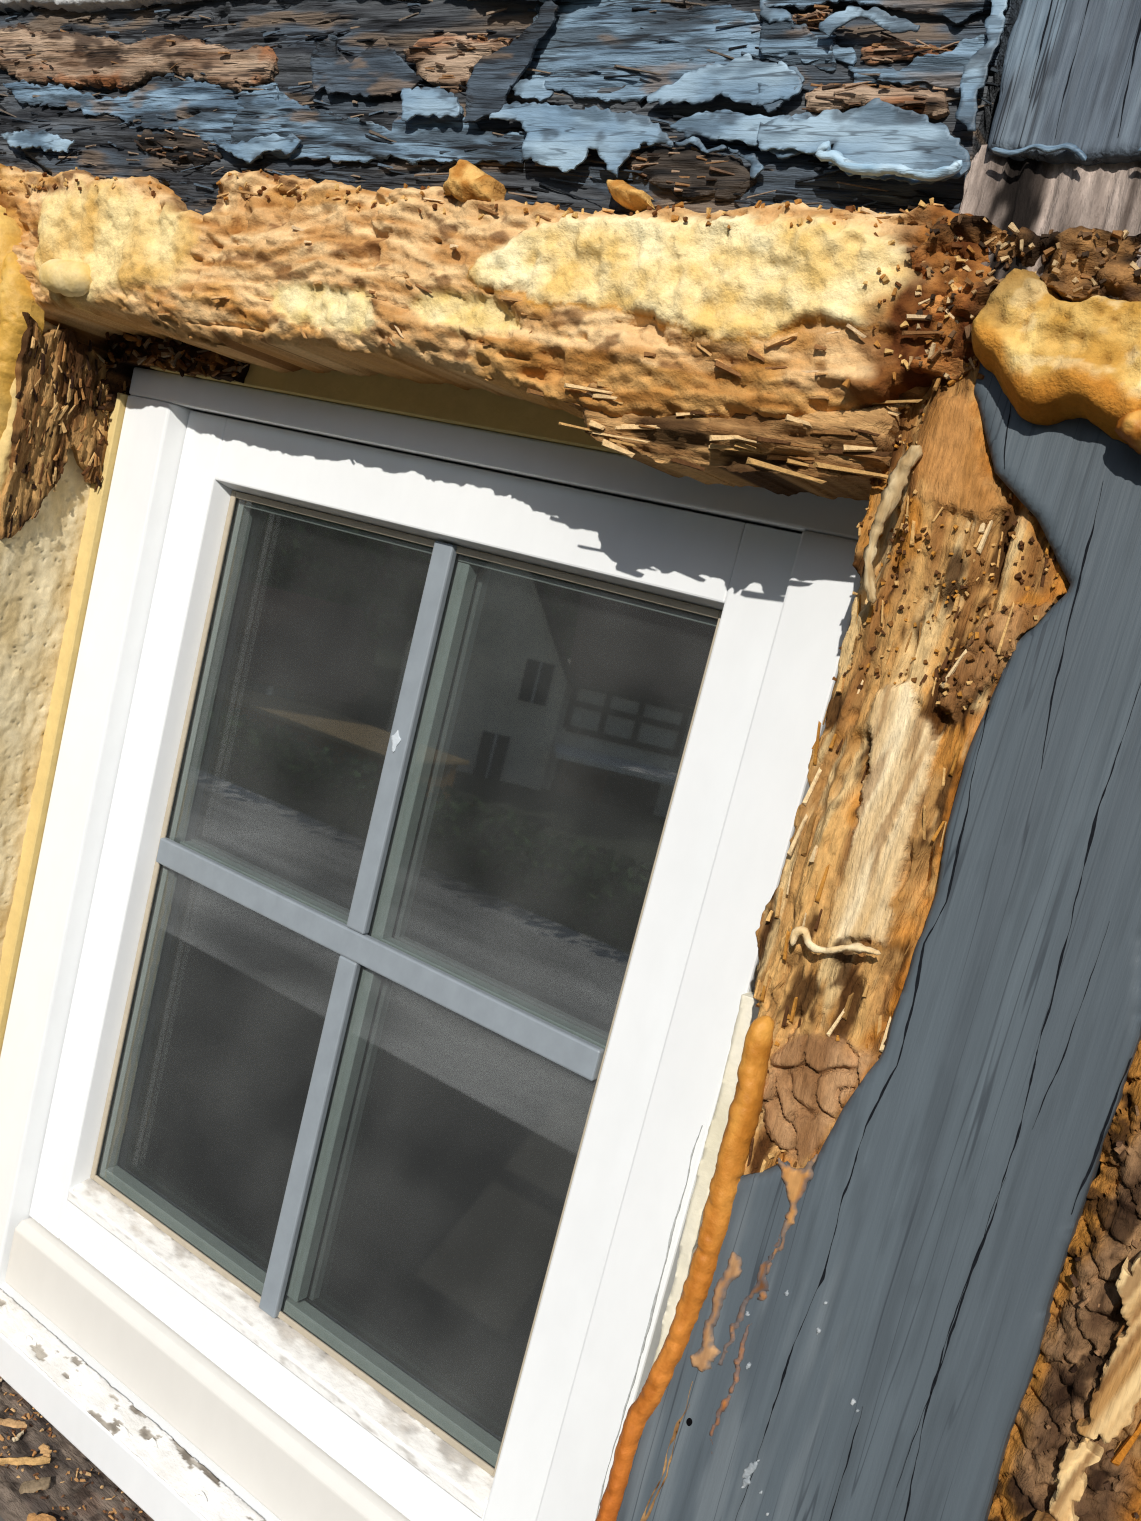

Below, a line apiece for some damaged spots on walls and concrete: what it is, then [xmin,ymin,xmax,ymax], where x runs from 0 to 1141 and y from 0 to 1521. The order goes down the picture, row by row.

peeling [0,0,1008,202]
peeling [991,143,1087,161]
crack [1029,0,1090,138]
crack [1118,19,1141,137]
peeling [0,1288,266,1521]